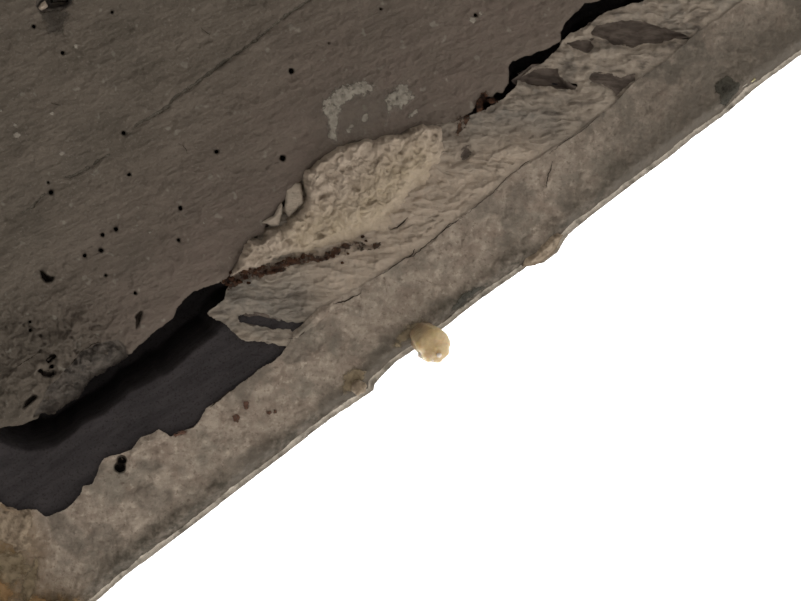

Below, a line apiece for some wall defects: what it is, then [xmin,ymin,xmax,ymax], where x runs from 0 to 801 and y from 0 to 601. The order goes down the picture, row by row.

spalling [36,0,72,12]
spalling [467,0,644,116]
leakage [322,81,374,141]
leakage [385,84,418,125]
peeling [262,183,304,226]
rust [222,235,381,290]
spalling [238,315,303,332]
spalling [0,282,287,553]